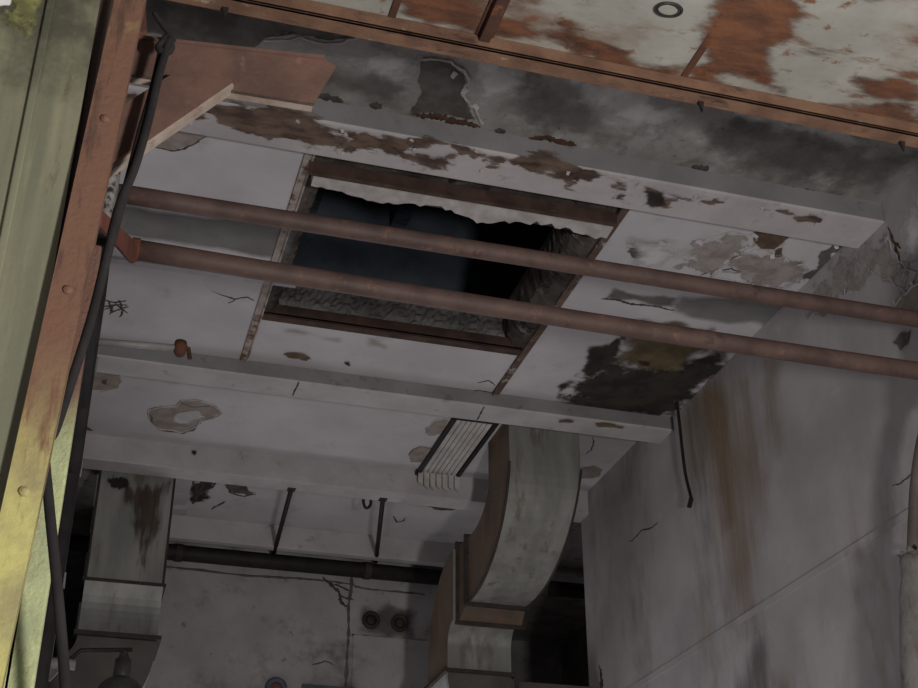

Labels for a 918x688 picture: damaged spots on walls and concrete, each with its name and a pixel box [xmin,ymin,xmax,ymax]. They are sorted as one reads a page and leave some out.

corrosion [401,0,484,31]
corrosion [495,0,802,87]
water stain [326,50,415,100]
flaking render [411,57,484,125]
water stain [472,60,524,104]
water stain [525,80,682,138]
corrosion [823,77,918,123]
peeling [156,101,601,191]
water stain [711,112,899,182]
peeling [676,231,843,289]
flaking render [147,399,222,434]
flaking render [225,484,256,497]